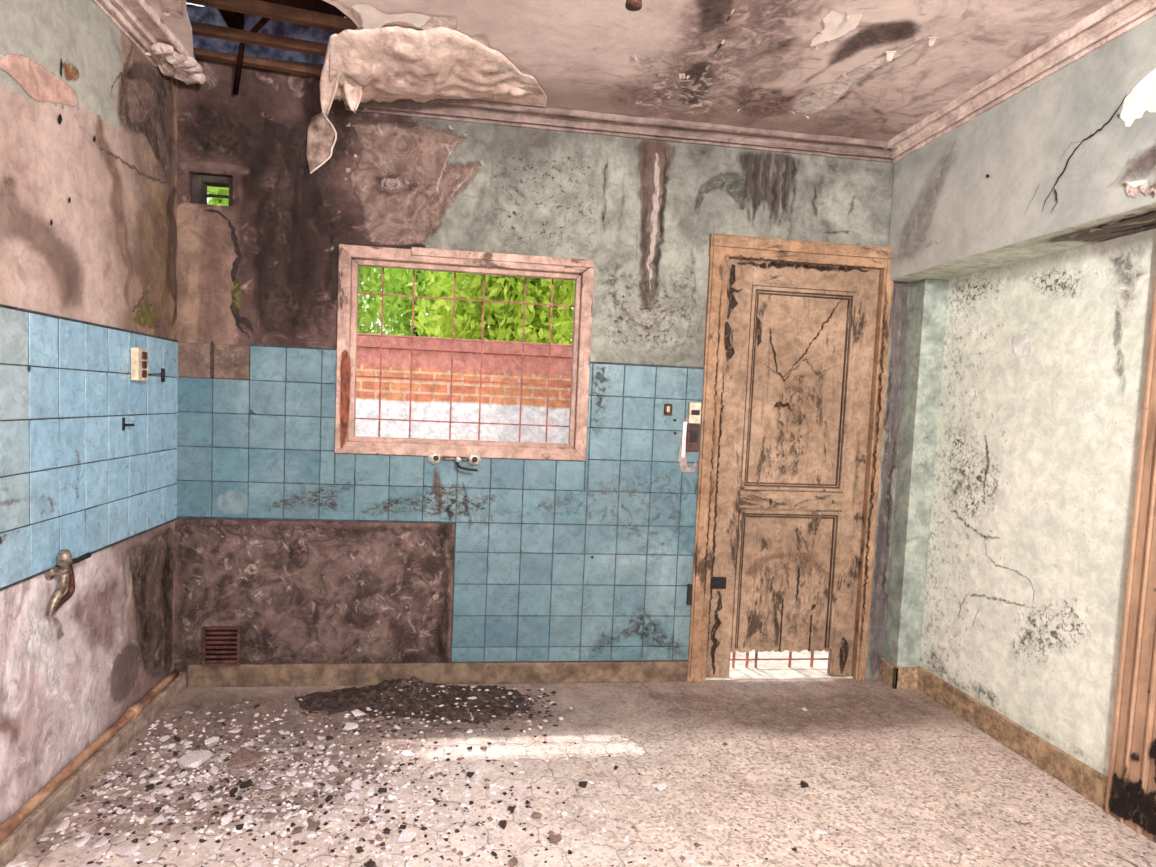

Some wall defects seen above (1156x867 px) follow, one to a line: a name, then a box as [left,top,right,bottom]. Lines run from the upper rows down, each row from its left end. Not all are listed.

peeling [0,54,82,110]
damp [618,0,807,117]
peeling [810,10,864,50]
damp [831,21,916,64]
peeling [1118,68,1156,127]
crack [1025,95,1127,213]
damp [194,105,350,331]
damp [695,153,798,221]
peeling [1049,179,1156,242]
spalling [178,521,455,666]
damp [1013,600,1083,657]